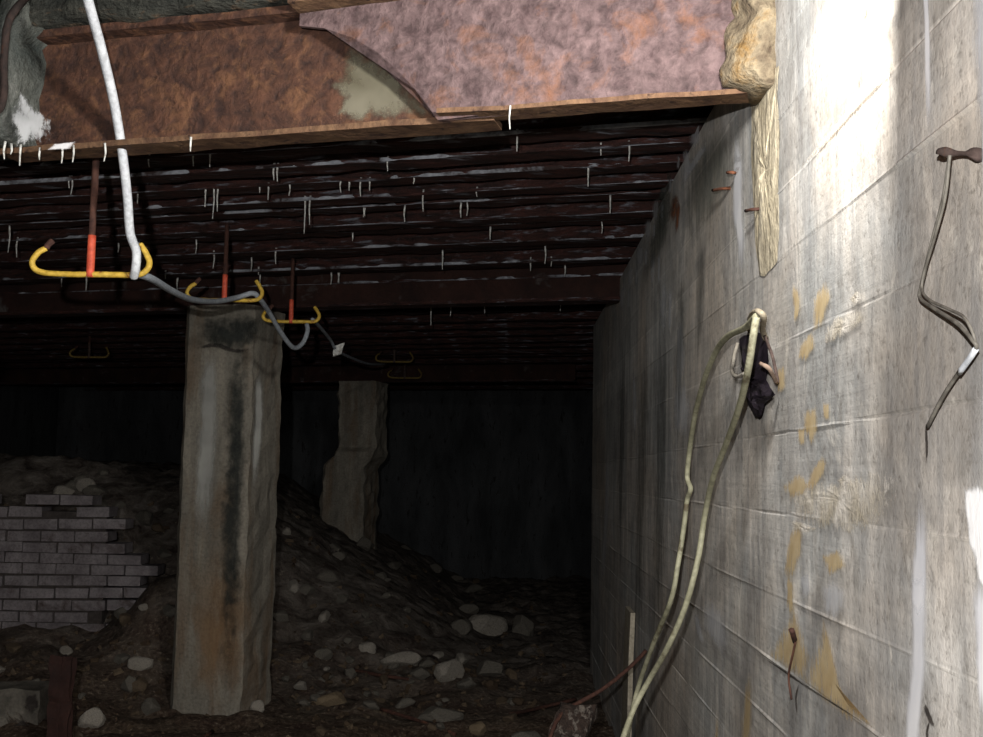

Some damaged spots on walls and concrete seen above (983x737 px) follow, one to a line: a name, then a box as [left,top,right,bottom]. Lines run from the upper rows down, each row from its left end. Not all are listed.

water stain [206,320,257,346]
water stain [197,366,216,509]
water stain [224,382,262,615]
crack [770,662,859,720]